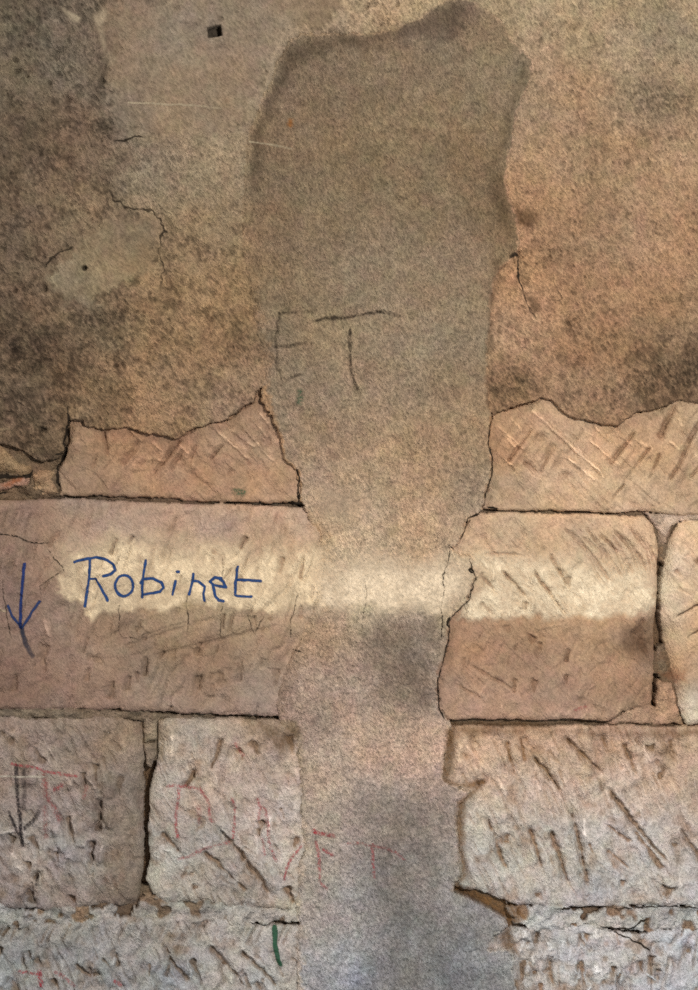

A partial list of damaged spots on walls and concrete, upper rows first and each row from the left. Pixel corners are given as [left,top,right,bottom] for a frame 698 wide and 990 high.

crack [510,252,535,316]
spalling [0,384,300,504]
spalling [483,395,698,516]